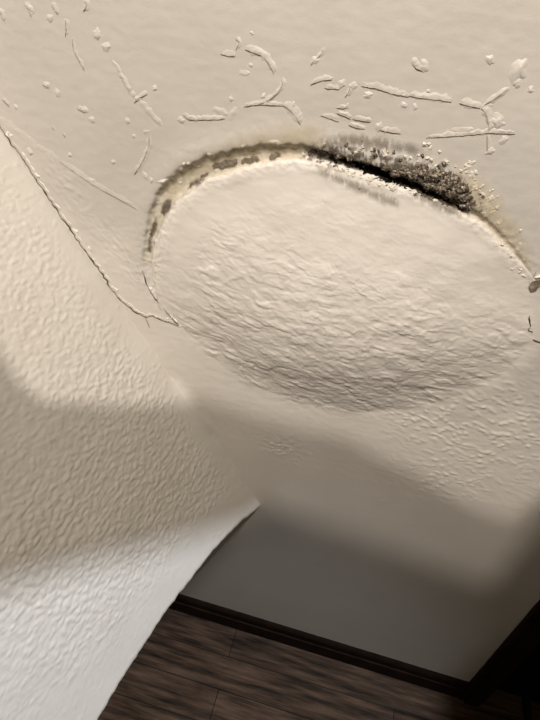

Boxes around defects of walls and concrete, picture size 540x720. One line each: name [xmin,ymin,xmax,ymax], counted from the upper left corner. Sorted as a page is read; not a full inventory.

crack [0,125,182,328]
peeling [143,140,306,262]
spalling [358,176,396,192]
damp [302,142,485,213]
spalling [403,142,540,292]